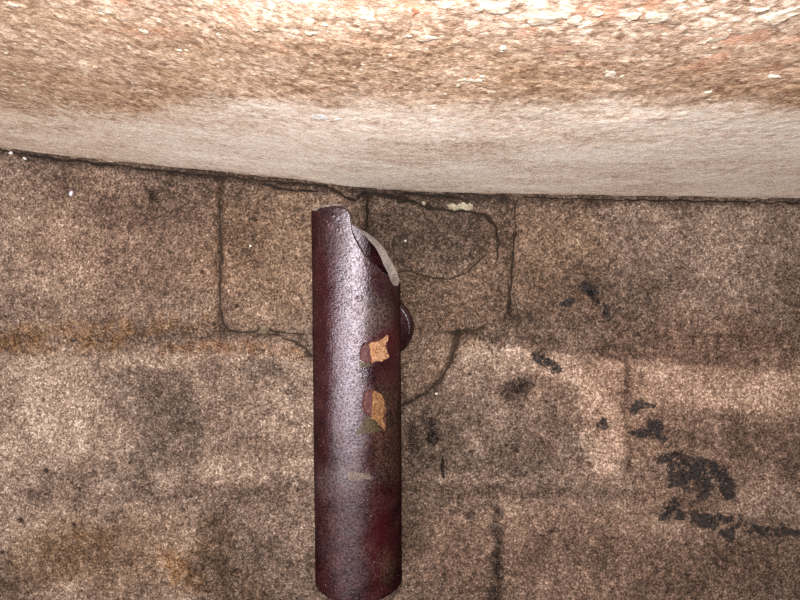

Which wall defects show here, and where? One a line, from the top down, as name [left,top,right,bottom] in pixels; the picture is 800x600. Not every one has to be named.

crack [0,150,800,358]
damp [559,281,599,307]
crack [401,327,485,406]
damp [532,351,563,374]
damp [630,397,657,415]
damp [659,499,800,544]